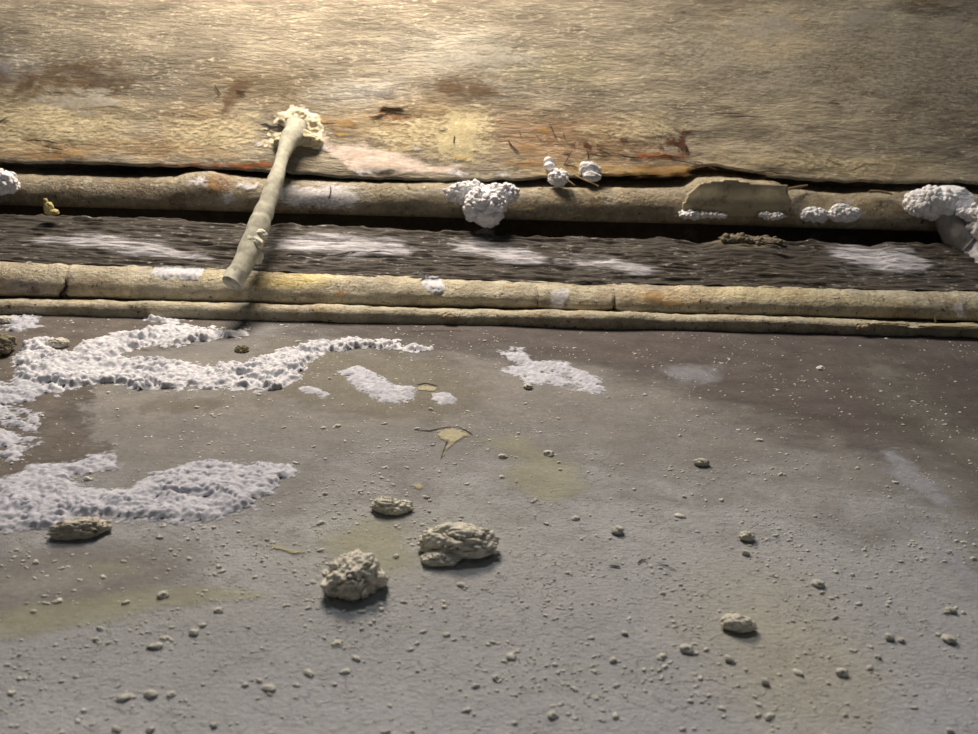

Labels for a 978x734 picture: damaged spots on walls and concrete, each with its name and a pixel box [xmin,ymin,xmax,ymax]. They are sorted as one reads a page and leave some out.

damp [167,46,539,177]
corrosion [602,127,692,176]
damp [222,183,258,204]
damp [279,185,359,209]
damp [0,314,978,534]